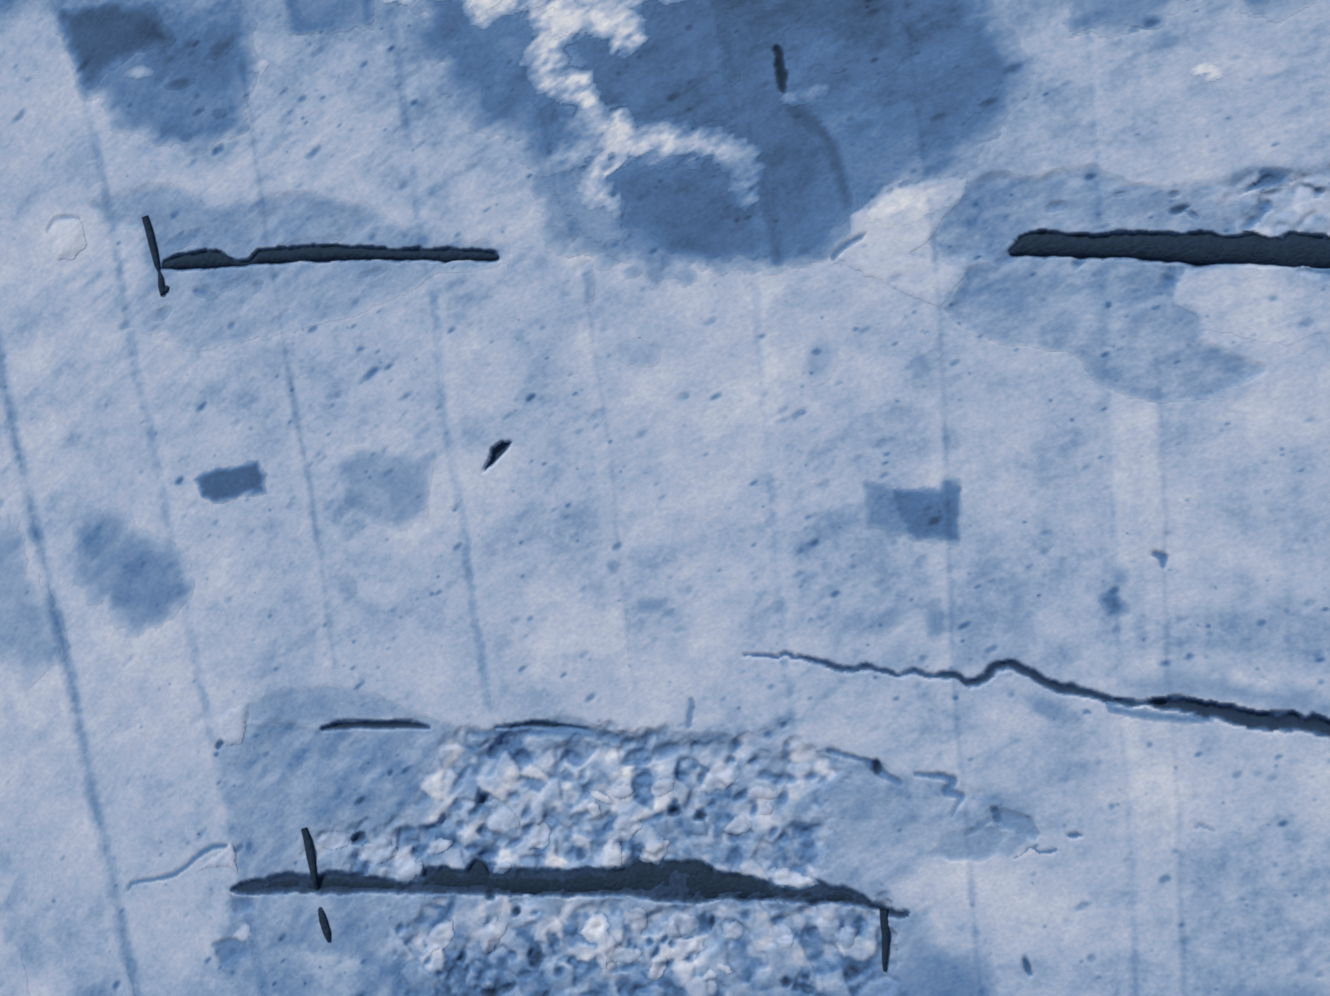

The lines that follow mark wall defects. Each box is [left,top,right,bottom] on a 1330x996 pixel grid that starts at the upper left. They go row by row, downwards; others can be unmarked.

leakage [49,0,270,156]
leakage [284,0,1034,306]
spalling [211,682,1043,996]
crack [743,651,1330,737]